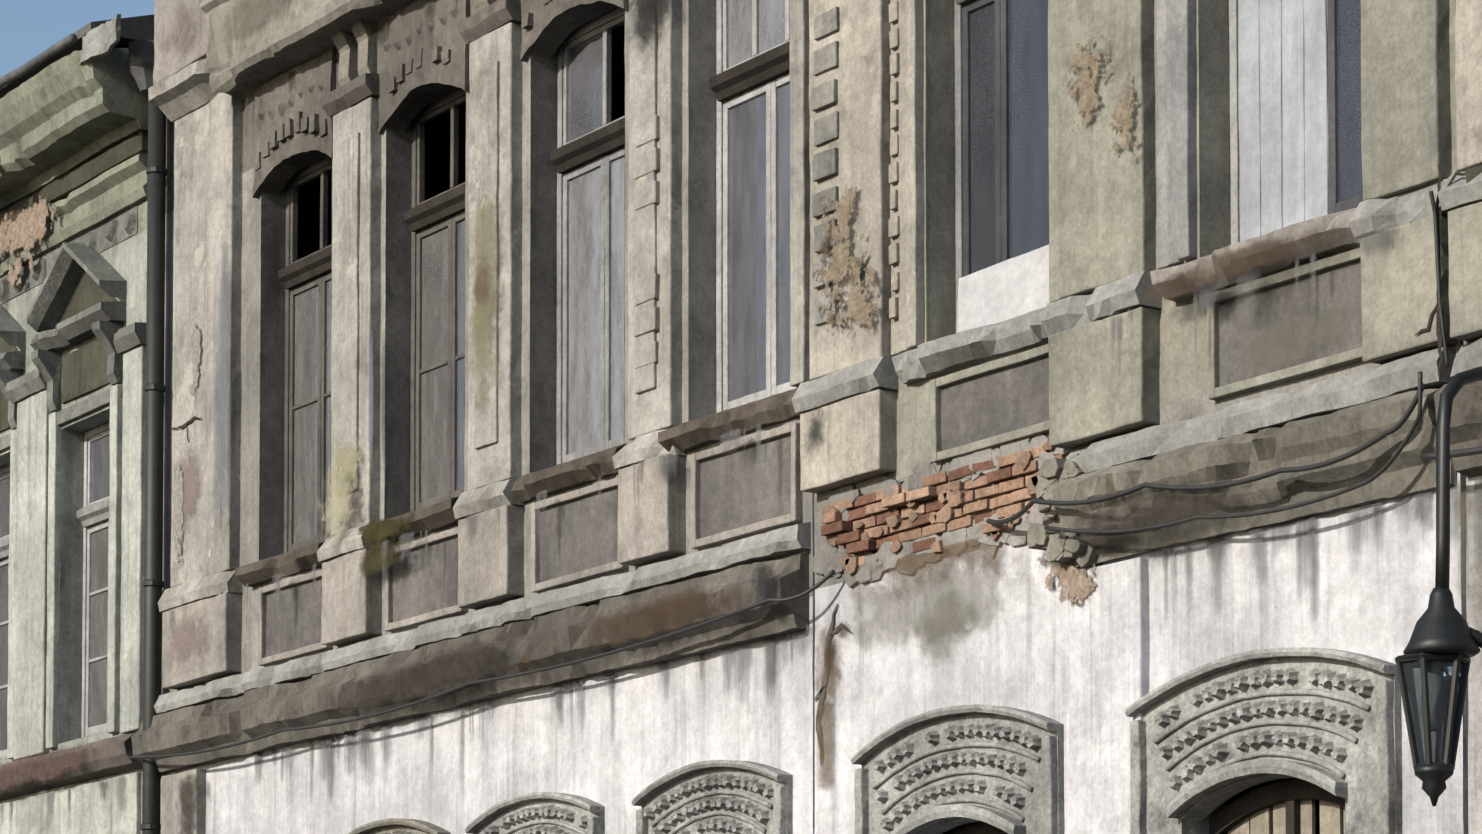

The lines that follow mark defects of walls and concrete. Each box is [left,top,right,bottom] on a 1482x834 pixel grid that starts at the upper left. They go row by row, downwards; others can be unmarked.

flaking render [0,193,56,288]
flaking render [812,185,878,352]
flaking render [812,434,1103,607]
damp [1075,475,1252,553]
damp [337,641,525,712]
crack [814,604,853,764]